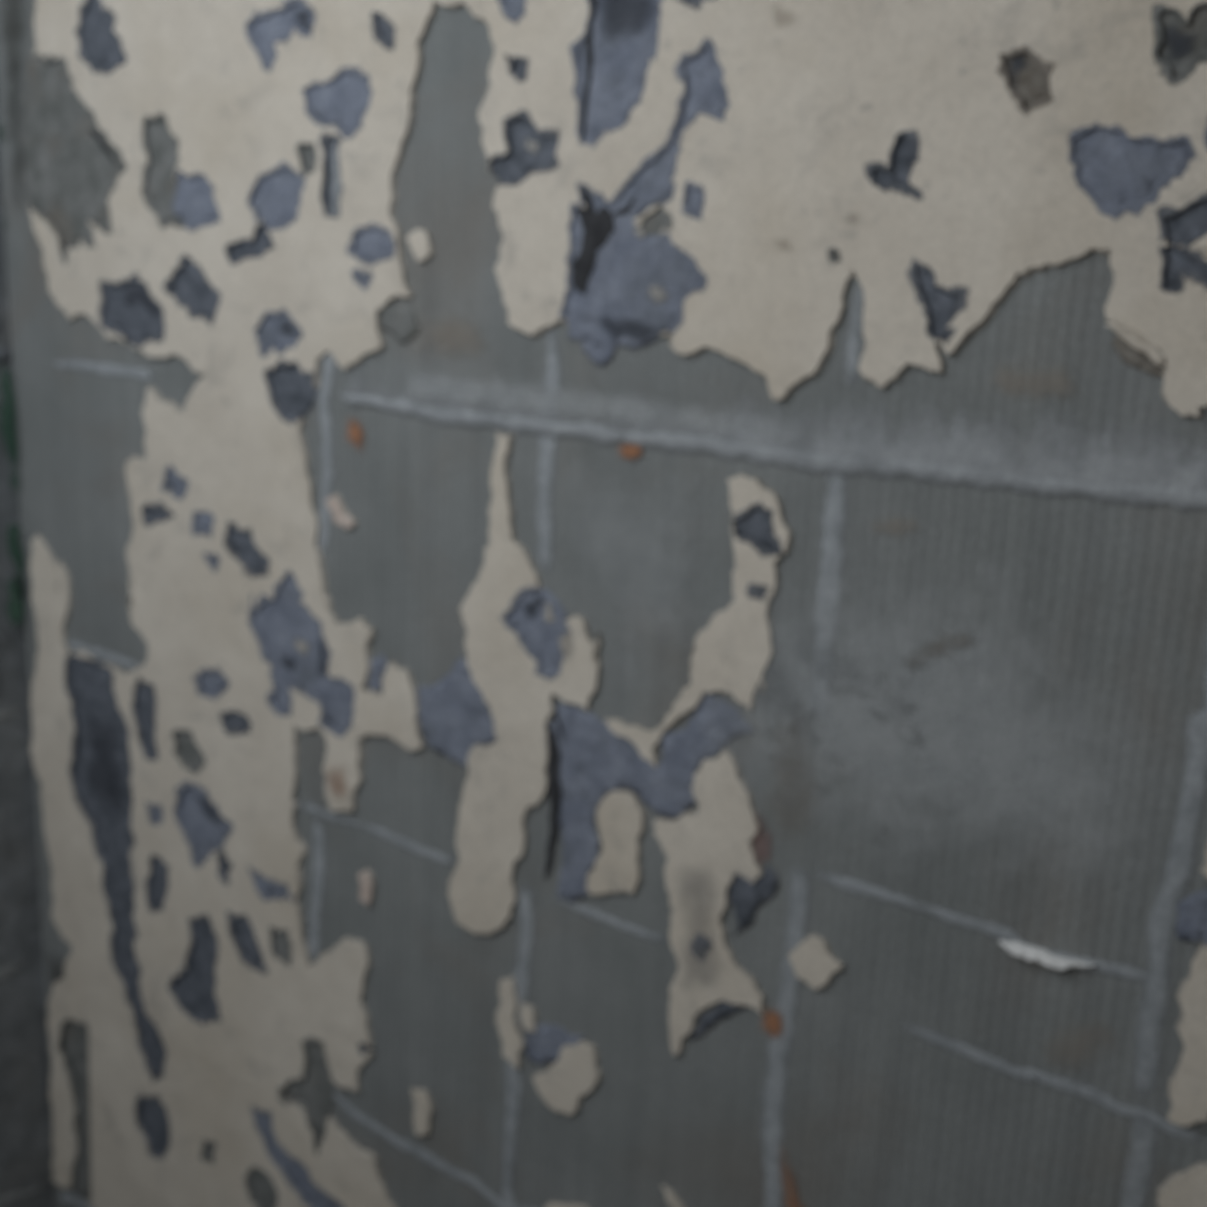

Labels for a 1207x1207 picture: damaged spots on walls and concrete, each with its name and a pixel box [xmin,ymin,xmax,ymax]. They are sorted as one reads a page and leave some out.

spalling [417,654,498,769]
spalling [490,431,792,1015]
crack [543,699,565,881]
peeling [999,940,1096,970]
spalling [524,1022,587,1066]
spalling [676,1000,746,1055]
peeling [1167,943,1207,1126]
peeling [1156,1163,1207,1207]